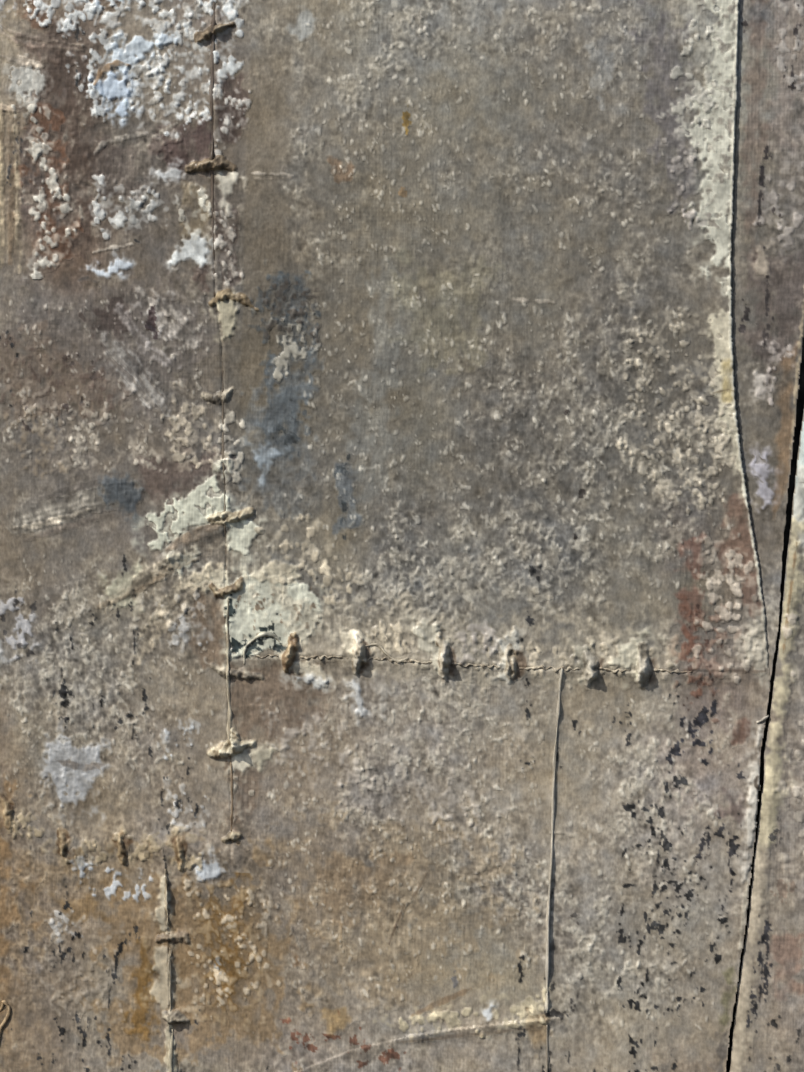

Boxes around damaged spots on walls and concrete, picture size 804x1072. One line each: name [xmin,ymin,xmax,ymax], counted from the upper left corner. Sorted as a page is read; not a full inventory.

peeling [0,0,252,154]
peeling [0,53,81,291]
peeling [78,155,250,292]
peeling [0,276,586,1072]
rust [670,491,761,712]
crack [724,541,799,675]
crack [752,774,761,791]